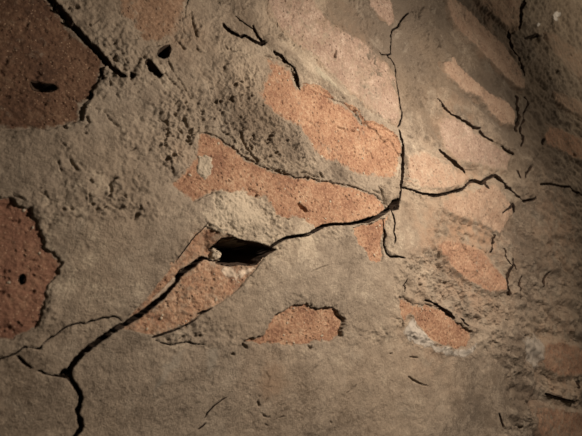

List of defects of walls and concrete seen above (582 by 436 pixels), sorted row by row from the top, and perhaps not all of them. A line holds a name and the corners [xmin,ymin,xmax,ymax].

spalling [0,0,105,131]
crack [47,0,135,80]
crack [222,16,300,90]
spalling [172,133,388,263]
spalling [257,0,525,238]
crack [253,14,582,258]
spalling [0,197,62,340]
crack [4,225,213,436]
spalling [122,227,263,336]
spalling [244,304,342,346]
crack [424,300,469,326]
crack [489,234,522,298]